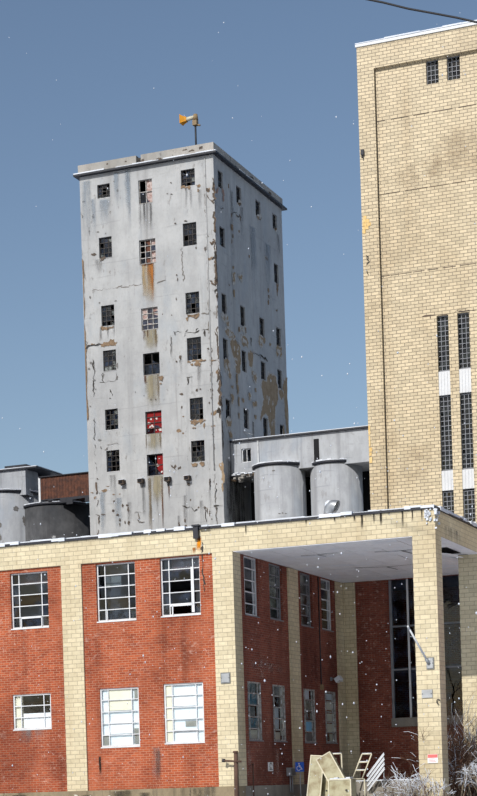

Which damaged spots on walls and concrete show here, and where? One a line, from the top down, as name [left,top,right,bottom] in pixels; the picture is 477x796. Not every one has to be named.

corrosion [142,263,153,290]
crack [170,178,241,524]
peeling [176,311,289,439]